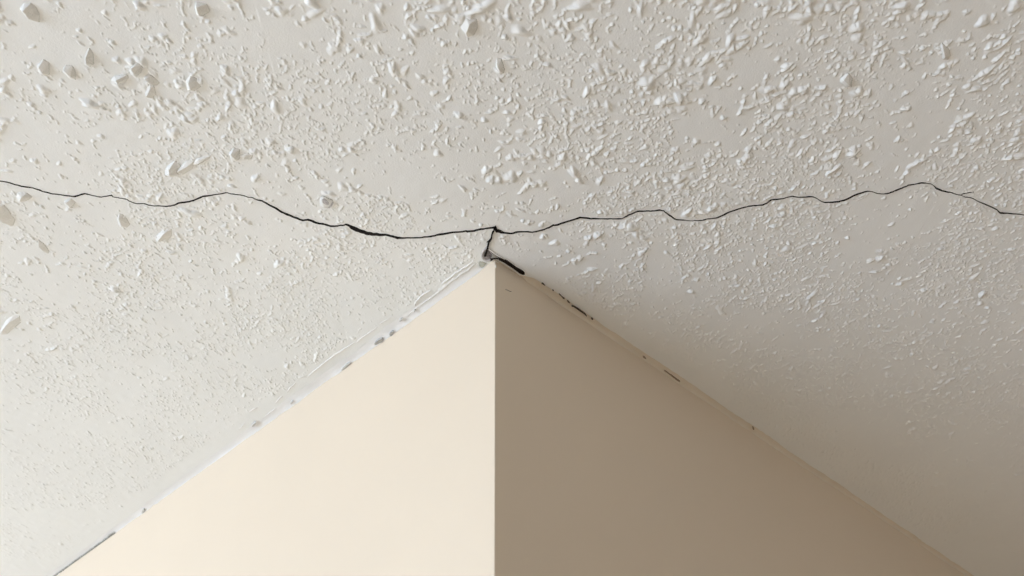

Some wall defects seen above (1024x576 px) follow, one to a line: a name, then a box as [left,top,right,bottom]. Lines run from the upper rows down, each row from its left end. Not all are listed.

crack [0,181,1023,257]